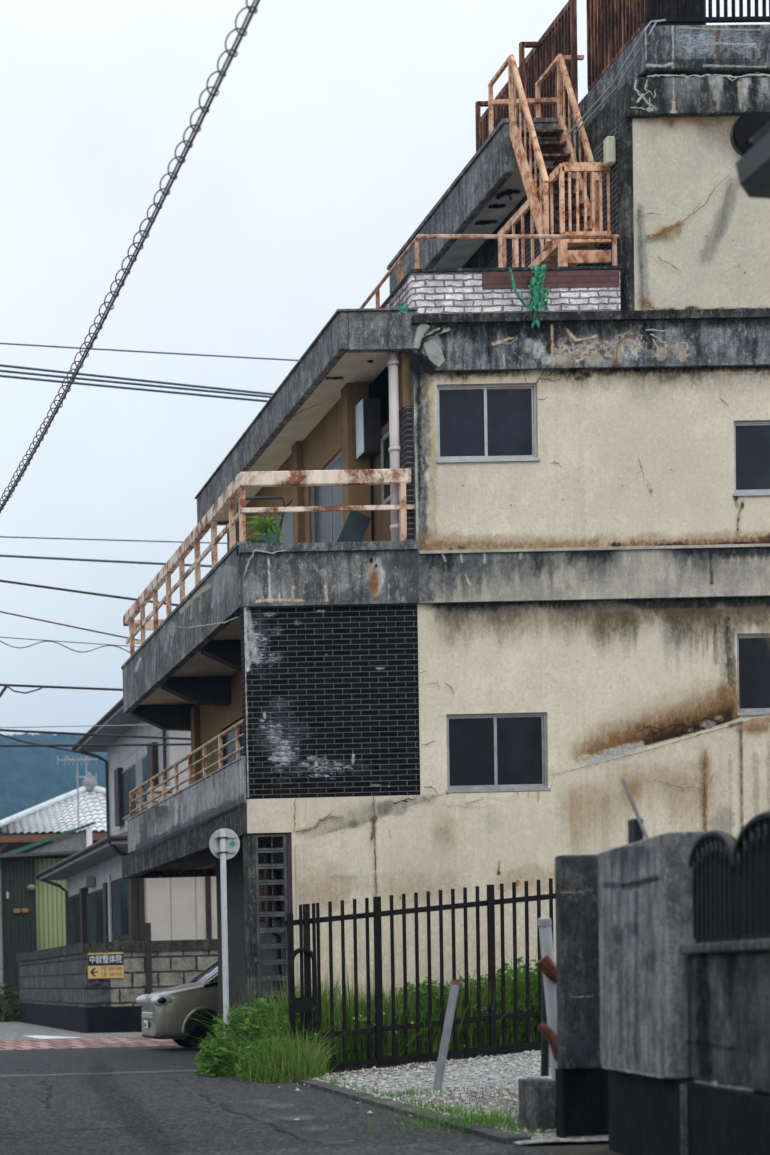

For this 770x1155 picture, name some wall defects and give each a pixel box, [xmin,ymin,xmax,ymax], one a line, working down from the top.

corrosion [646,221,683,239]
crack [641,174,730,273]
spalling [408,322,452,375]
water stain [439,305,770,380]
corrosion [611,496,770,547]
corrosion [366,558,385,599]
water stain [392,372,770,757]
water stain [136,558,278,852]
water stain [262,713,354,777]
crack [294,799,338,832]